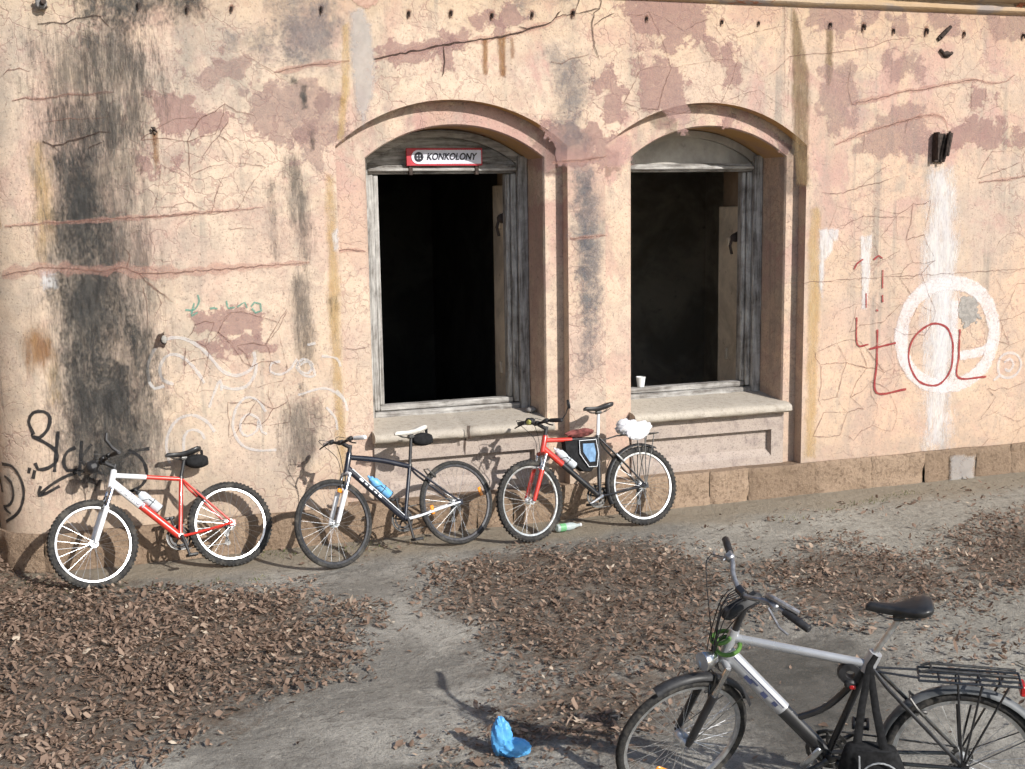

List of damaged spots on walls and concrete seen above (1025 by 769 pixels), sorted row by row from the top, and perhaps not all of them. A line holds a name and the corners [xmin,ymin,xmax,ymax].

water stain [89,0,201,29]
crack [244,0,614,76]
corrosion [484,37,505,76]
flaking render [540,0,742,170]
flaking render [944,82,1025,151]
water stain [42,36,149,484]